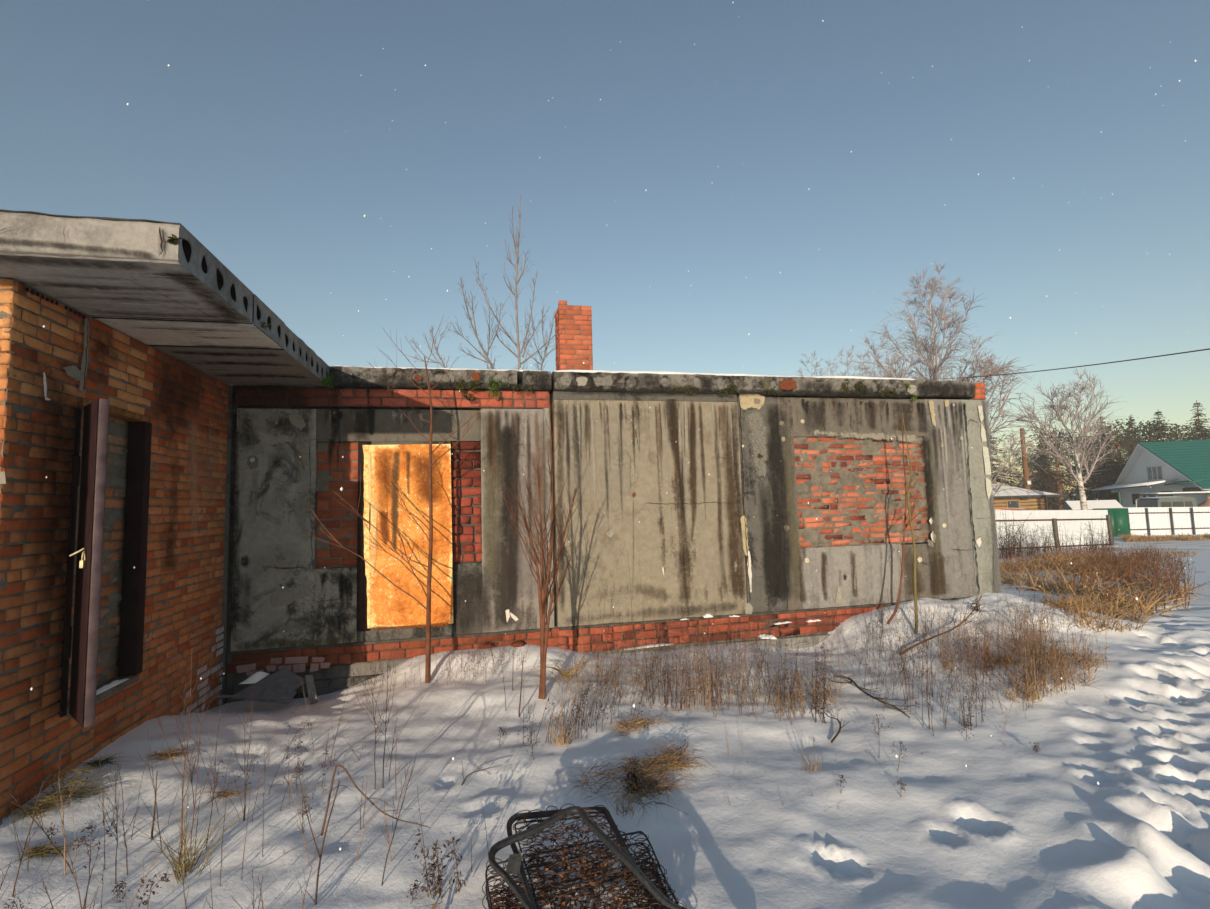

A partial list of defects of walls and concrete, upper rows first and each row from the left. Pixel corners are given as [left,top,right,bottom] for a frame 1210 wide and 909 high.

water stain [0,230,245,392]
water stain [175,346,305,378]
water stain [345,374,547,389]
water stain [325,408,375,467]
spalling [739,394,769,476]
water stain [179,419,254,715]
water stain [240,572,353,649]
corrosion [379,452,437,549]
water stain [459,412,538,629]
peeling [740,516,753,614]
water stain [557,376,973,613]